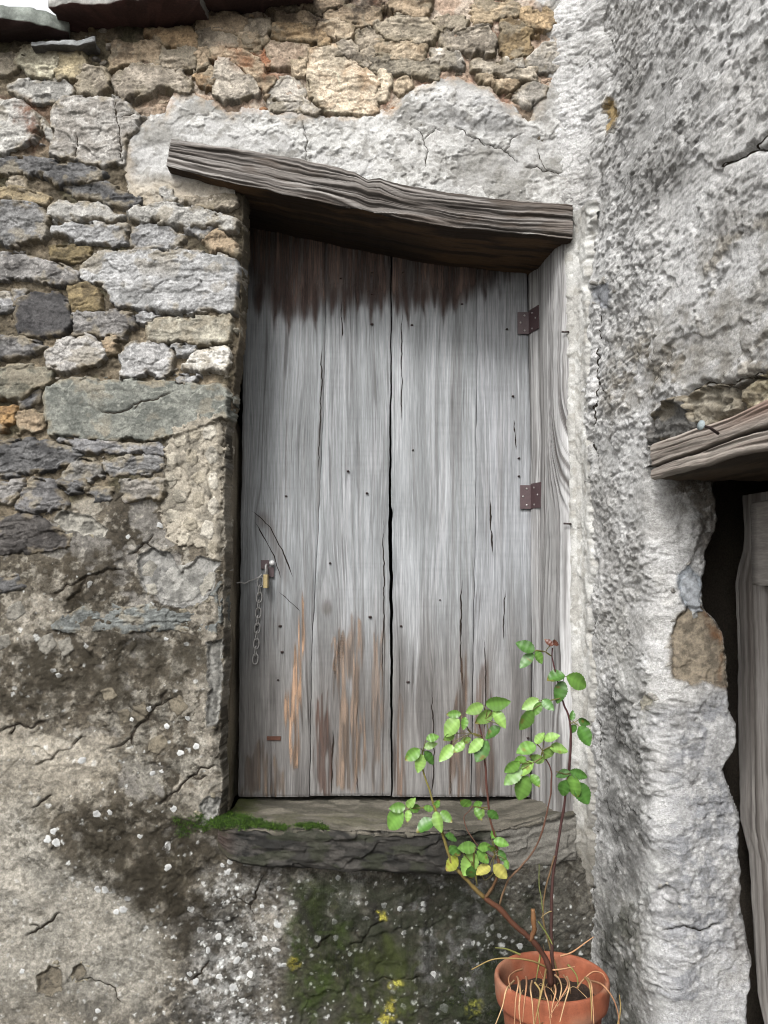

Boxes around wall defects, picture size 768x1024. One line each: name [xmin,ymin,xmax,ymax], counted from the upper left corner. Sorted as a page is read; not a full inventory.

crack [418,128,559,174]
crack [721,135,768,167]
spalling [733,373,768,411]
spalling [664,560,728,688]
crack [2,721,44,734]
crack [112,694,177,748]
crack [161,766,212,804]
leakage [73,809,214,951]
crack [30,913,58,934]
spalling [35,960,90,997]
leakage [424,951,505,1024]